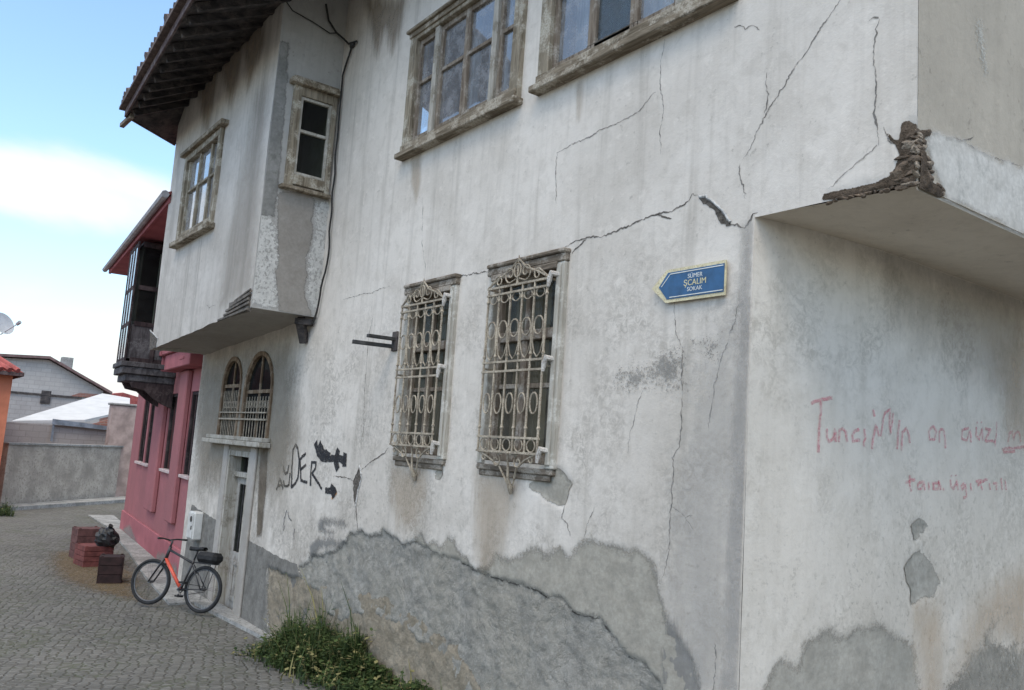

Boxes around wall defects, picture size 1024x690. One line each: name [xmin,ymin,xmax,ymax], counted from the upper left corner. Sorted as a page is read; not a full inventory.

crack [731,0,840,228]
crack [831,17,894,187]
peeling [252,42,329,316]
spalling [822,121,943,200]
crack [565,193,694,253]
crack [661,302,691,583]
flaking render [529,468,572,505]
flaking render [904,518,940,603]
flaking render [299,529,700,690]
peeling [765,624,920,690]
peeling [943,606,1024,690]